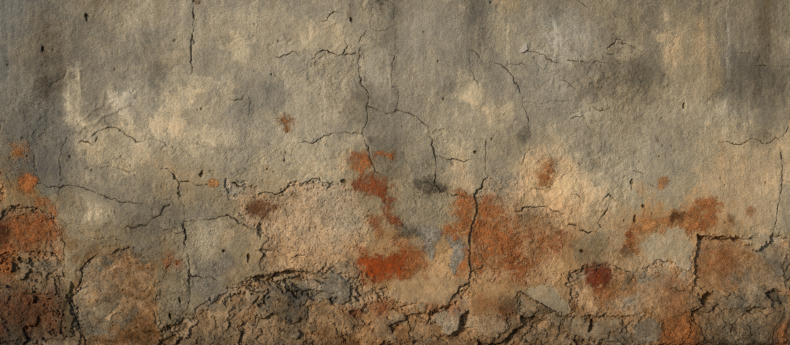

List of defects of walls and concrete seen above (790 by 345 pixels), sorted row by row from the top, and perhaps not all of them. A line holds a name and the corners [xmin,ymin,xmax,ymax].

spalling [0,173,65,262]
crack [7,127,142,204]
crack [5,168,257,345]
spalling [70,247,216,345]
corrosion [349,151,428,283]
crack [301,7,487,300]
corrosion [441,189,563,285]
crack [517,188,614,234]
peeling [390,54,790,345]
corrosion [584,263,612,293]
corrosion [620,198,723,256]
crack [720,127,789,237]